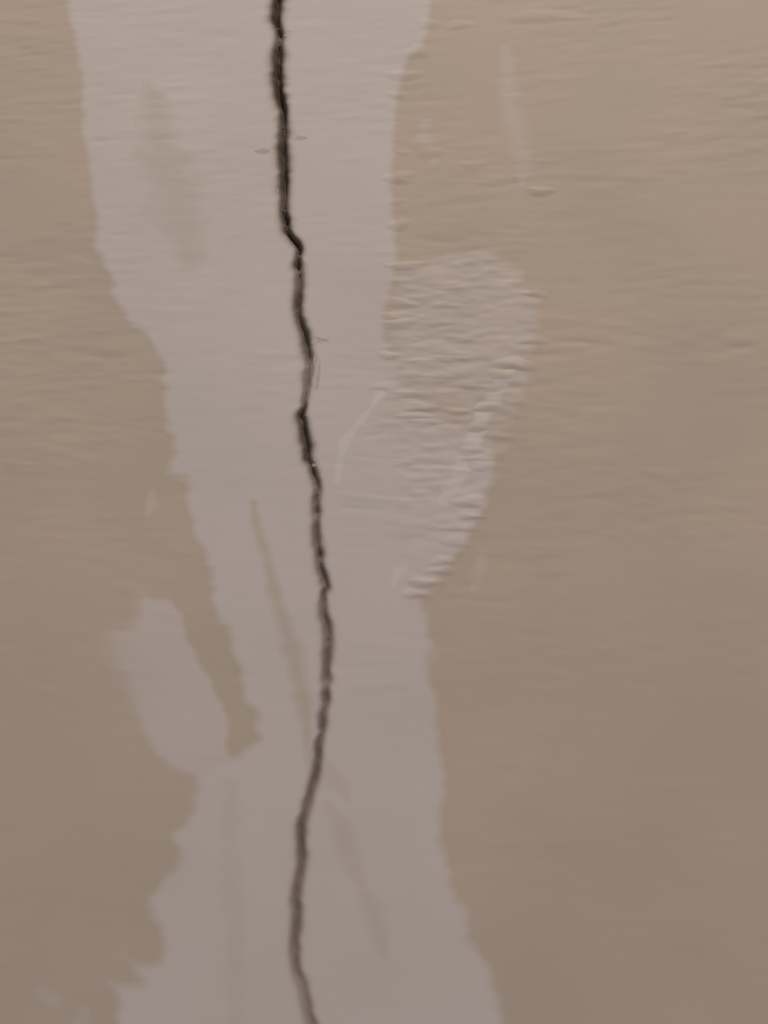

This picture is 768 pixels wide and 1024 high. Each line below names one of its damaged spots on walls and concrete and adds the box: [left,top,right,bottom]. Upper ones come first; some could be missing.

crack [261,0,340,1024]